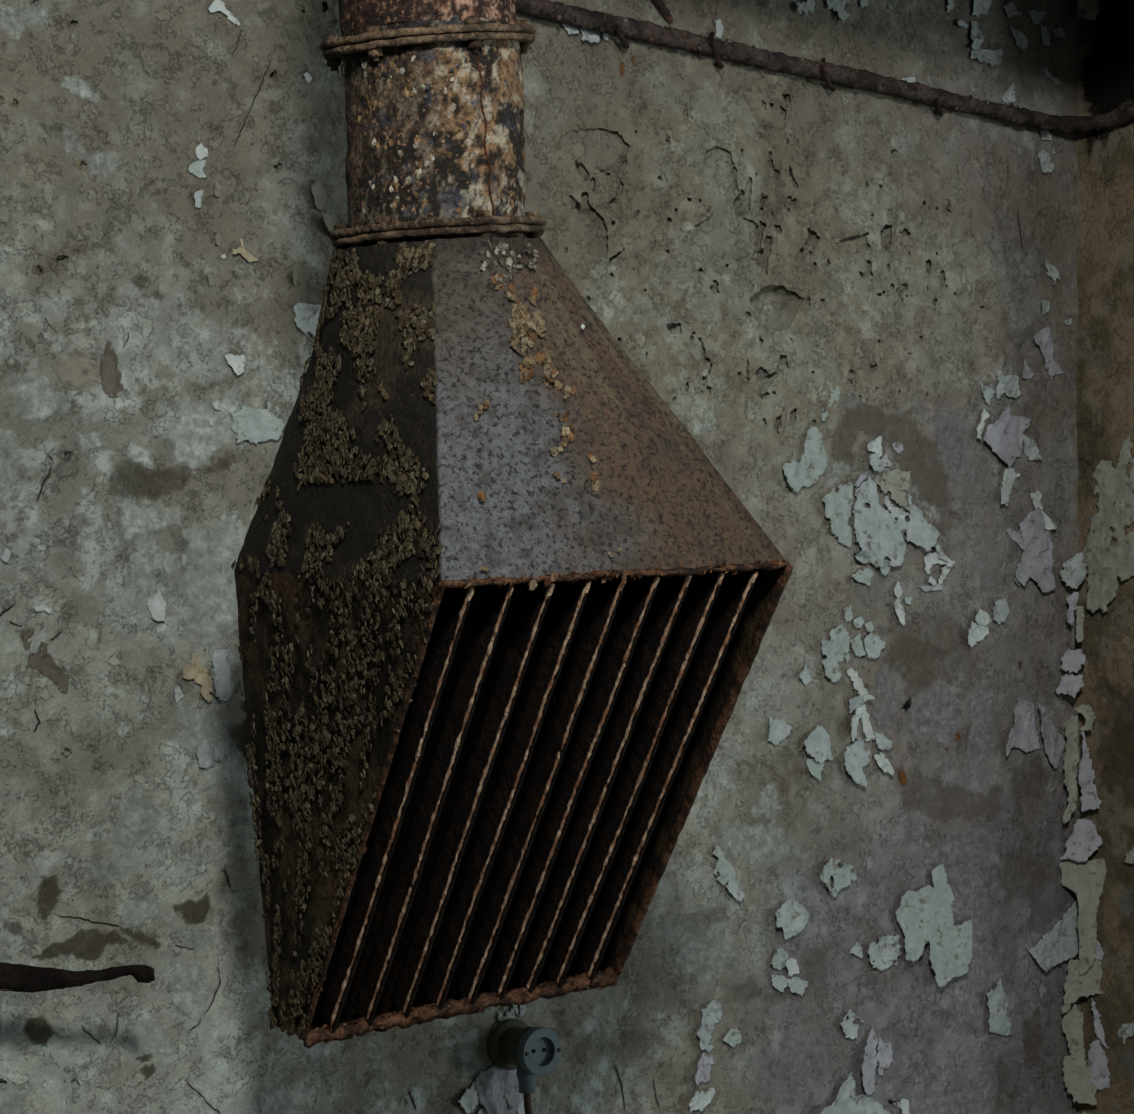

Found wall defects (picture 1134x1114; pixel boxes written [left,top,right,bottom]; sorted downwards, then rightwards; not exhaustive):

peeling [795,0,868,24]
peeling [946,0,1066,67]
damp [1080,0,1134,115]
peeling [783,381,841,495]
peeling [976,299,1063,506]
peeling [822,436,956,626]
peeling [173,240,442,1040]
peeling [968,598,1010,647]
peeling [1006,436,1134,1114]
peeling [848,864,973,987]
peeling [986,979,1011,1036]
peeling [458,1065,525,1114]